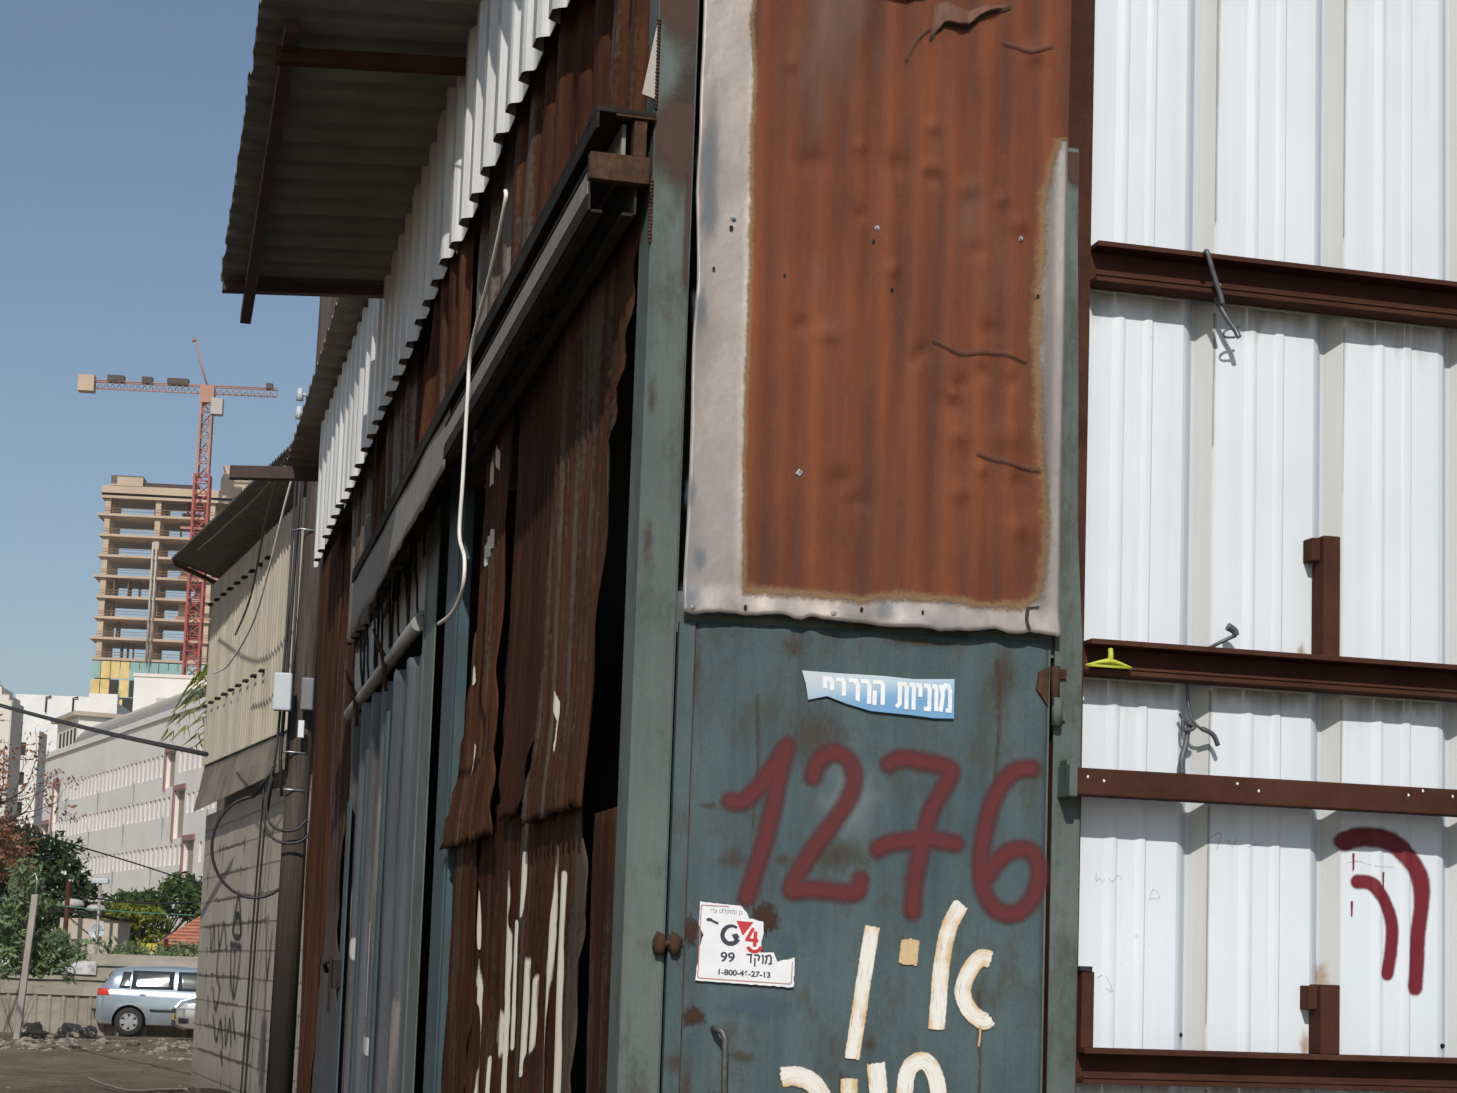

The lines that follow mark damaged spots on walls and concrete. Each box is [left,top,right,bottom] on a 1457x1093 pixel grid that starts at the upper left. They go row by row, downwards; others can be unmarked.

rust [742,0,1080,611]